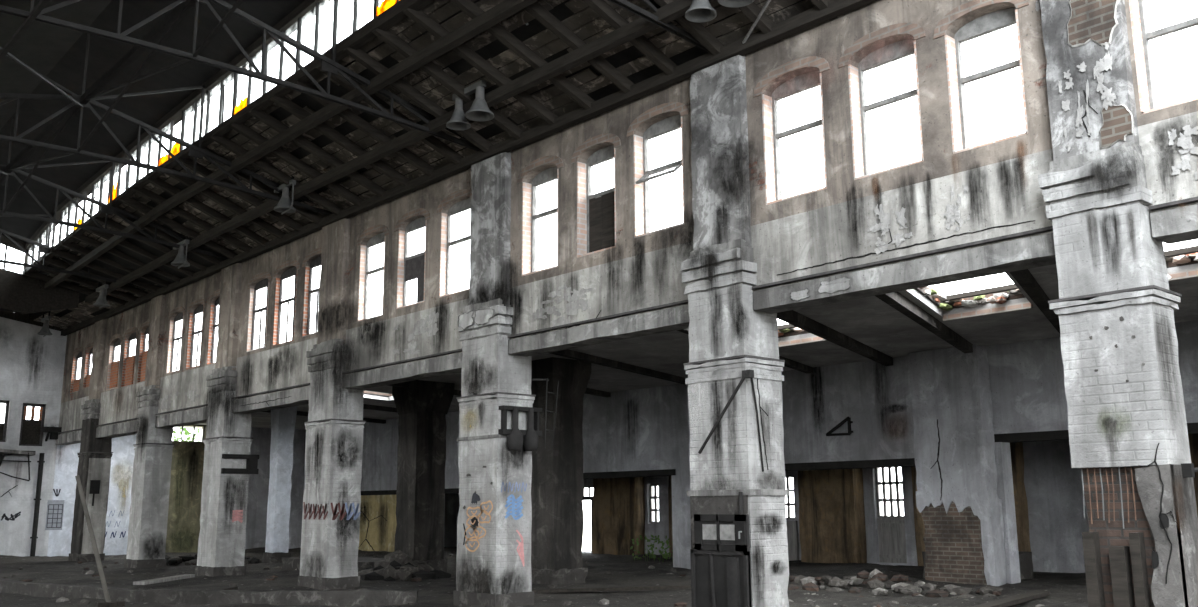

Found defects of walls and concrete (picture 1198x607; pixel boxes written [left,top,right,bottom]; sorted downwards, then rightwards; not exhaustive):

spalling [1058,0,1134,152]
damp [899,177,931,229]
damp [969,166,984,220]
damp [999,159,1023,206]
damp [501,260,522,335]
damp [705,205,740,344]
damp [313,350,351,411]
damp [308,433,323,487]
crack [931,419,943,500]
crack [1139,443,1178,584]